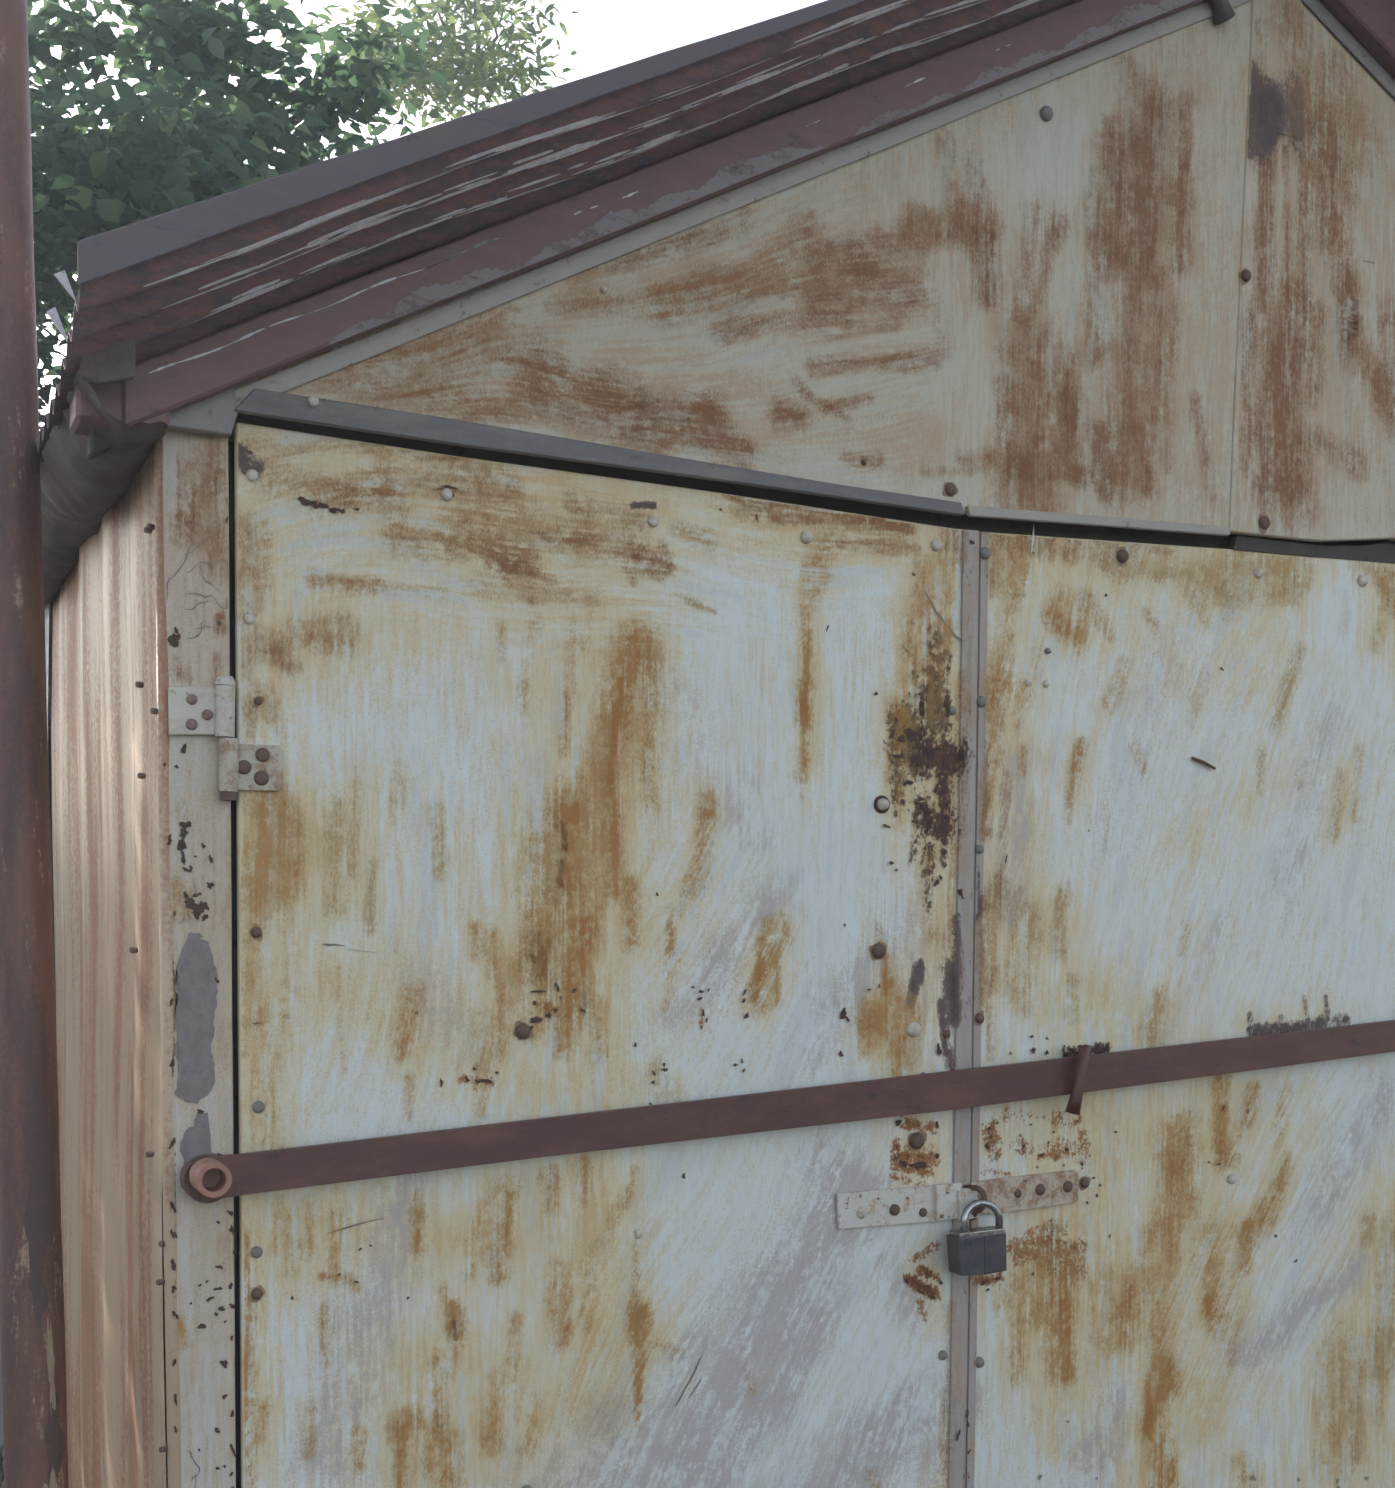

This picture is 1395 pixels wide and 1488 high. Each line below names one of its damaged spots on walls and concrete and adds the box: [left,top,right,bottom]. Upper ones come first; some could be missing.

peeling [149,146,828,374]
peeling [144,0,1040,327]
rust [959,57,1195,512]
rust [1240,1,1395,520]
peeling [177,821,213,872]
peeling [173,882,222,1190]
rust [471,622,657,1091]
rust [840,942,926,1077]
rust [890,1116,940,1187]
rust [903,1243,943,1321]
rust [875,531,1025,912]
rust [1247,995,1350,1036]